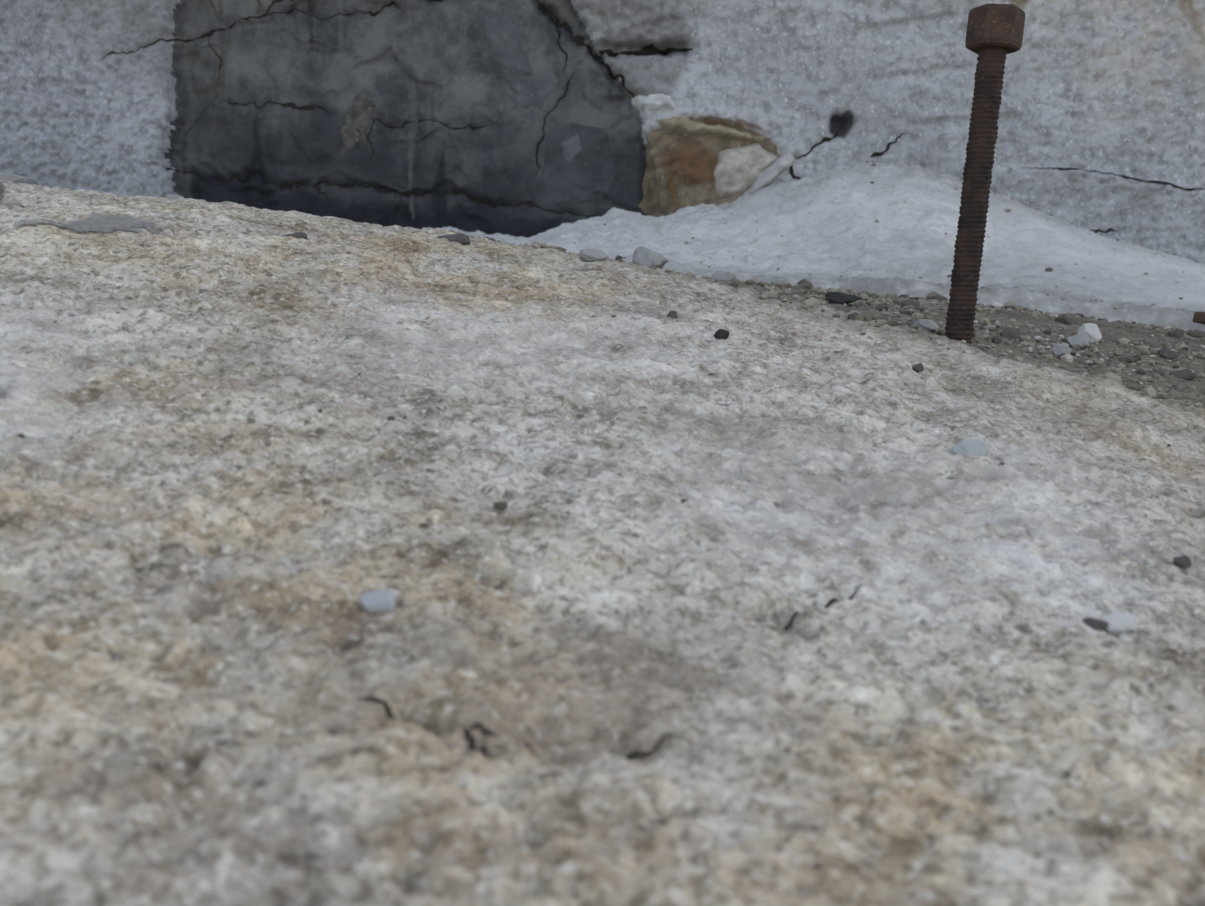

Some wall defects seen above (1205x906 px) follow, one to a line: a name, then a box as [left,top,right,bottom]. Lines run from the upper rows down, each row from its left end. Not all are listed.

crack [103,0,443,114]
crack [165,0,693,217]
crack [1091,226,1117,234]
crack [1034,167,1205,191]